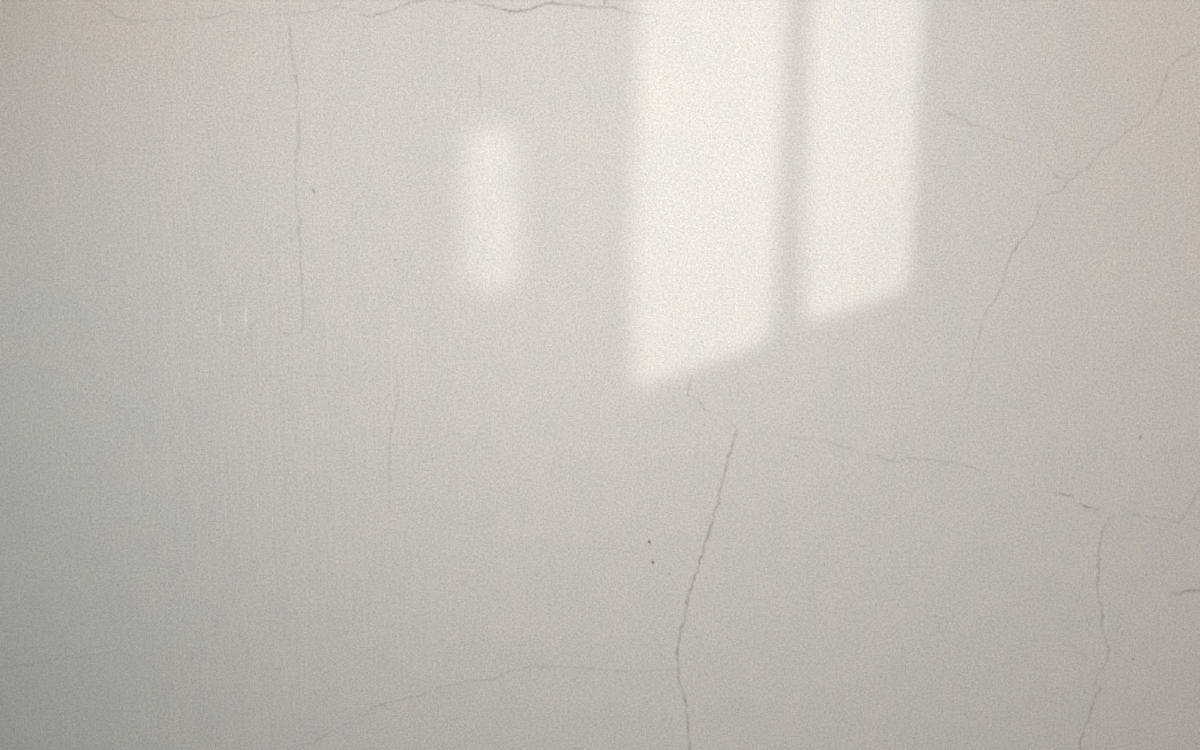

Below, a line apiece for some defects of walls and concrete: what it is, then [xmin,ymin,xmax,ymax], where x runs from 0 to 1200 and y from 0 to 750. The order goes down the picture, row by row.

crack [80,0,667,336]
crack [962,40,1200,402]
crack [1050,490,1113,750]